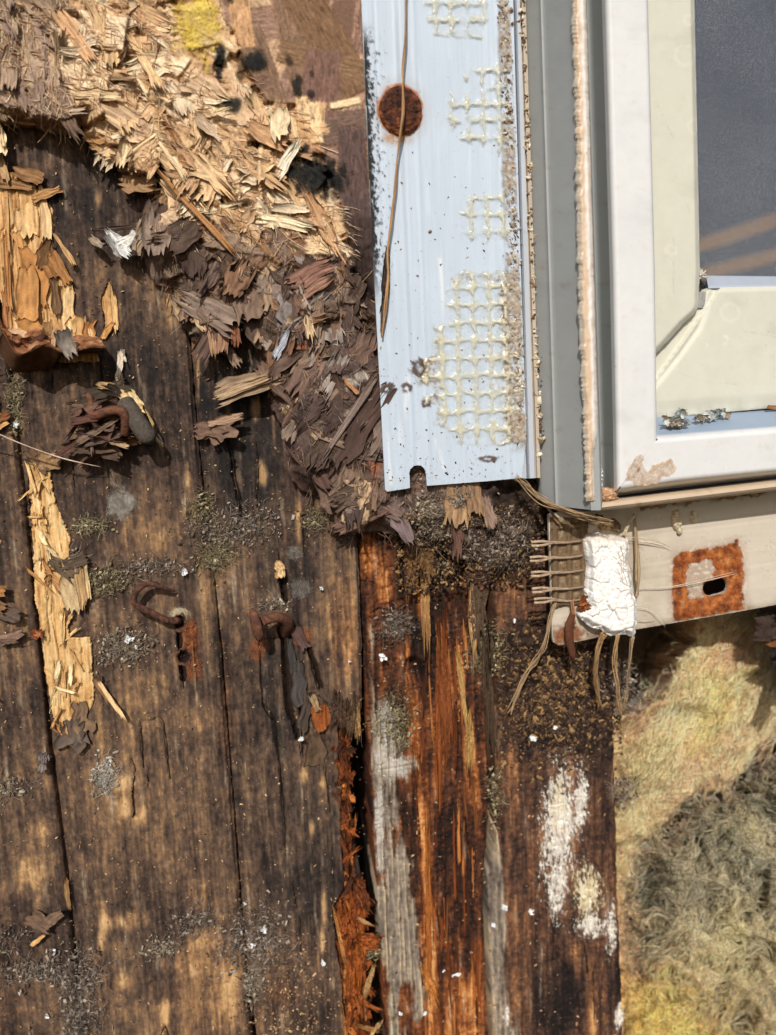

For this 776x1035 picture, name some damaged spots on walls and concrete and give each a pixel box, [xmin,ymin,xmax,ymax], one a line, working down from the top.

rust [377,83,423,142]
spalling [0,0,545,1035]
rust [672,539,745,621]
damp [375,786,384,866]
damp [537,754,617,956]